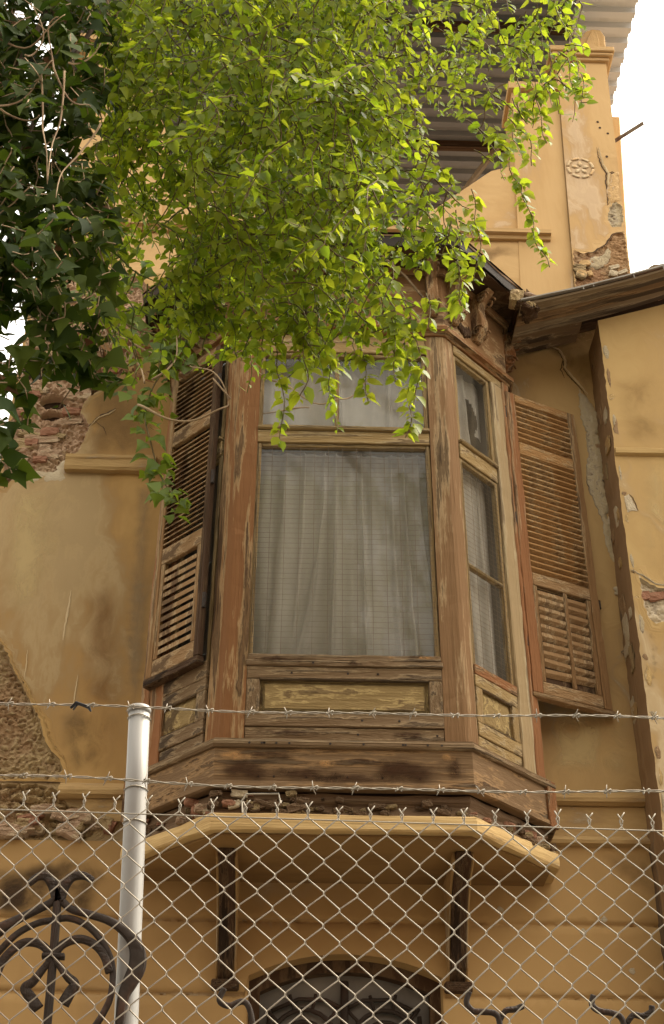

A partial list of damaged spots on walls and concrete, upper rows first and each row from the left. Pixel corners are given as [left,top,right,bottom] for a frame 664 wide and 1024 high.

spalling [40,276,97,315]
spalling [86,273,150,378]
flaking render [573,202,630,287]
spalling [10,368,98,482]
peeling [578,345,664,686]
flaking render [0,638,69,780]